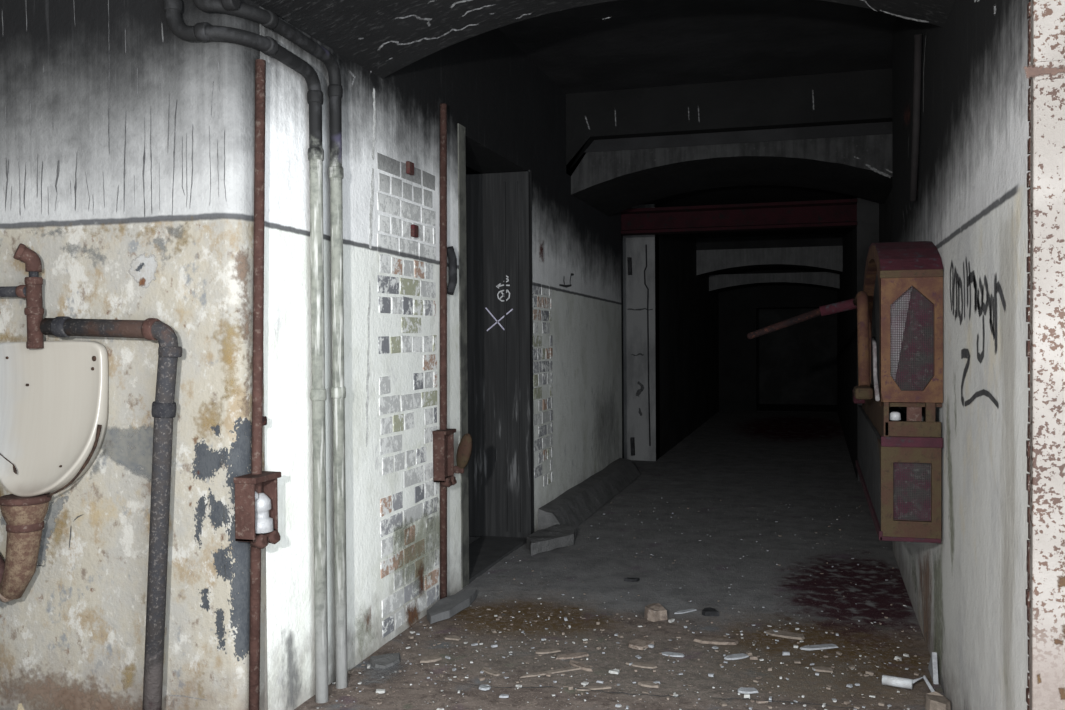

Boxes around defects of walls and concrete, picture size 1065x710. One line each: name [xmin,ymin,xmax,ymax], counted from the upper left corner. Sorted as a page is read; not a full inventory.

corrosion [1024,66,1065,78]
damp [5,65,193,216]
damp [209,131,226,198]
flaking render [154,226,182,251]
damp [222,324,238,392]
peeling [190,417,252,661]
damp [2,671,143,710]